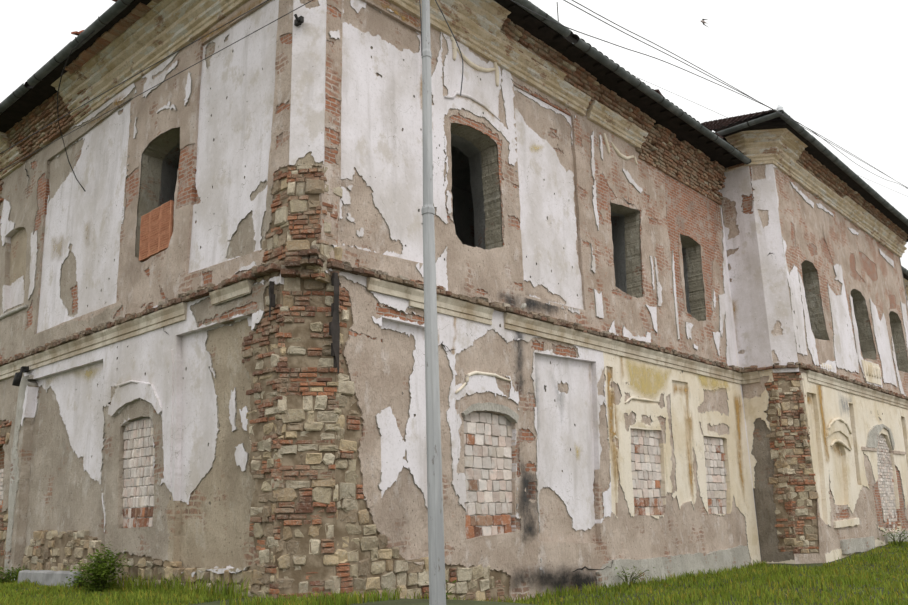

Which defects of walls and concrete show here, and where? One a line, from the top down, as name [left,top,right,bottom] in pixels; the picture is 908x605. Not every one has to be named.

flaking render [0,0,448,600]
leakage [520,471,534,535]
flaking render [434,18,908,602]